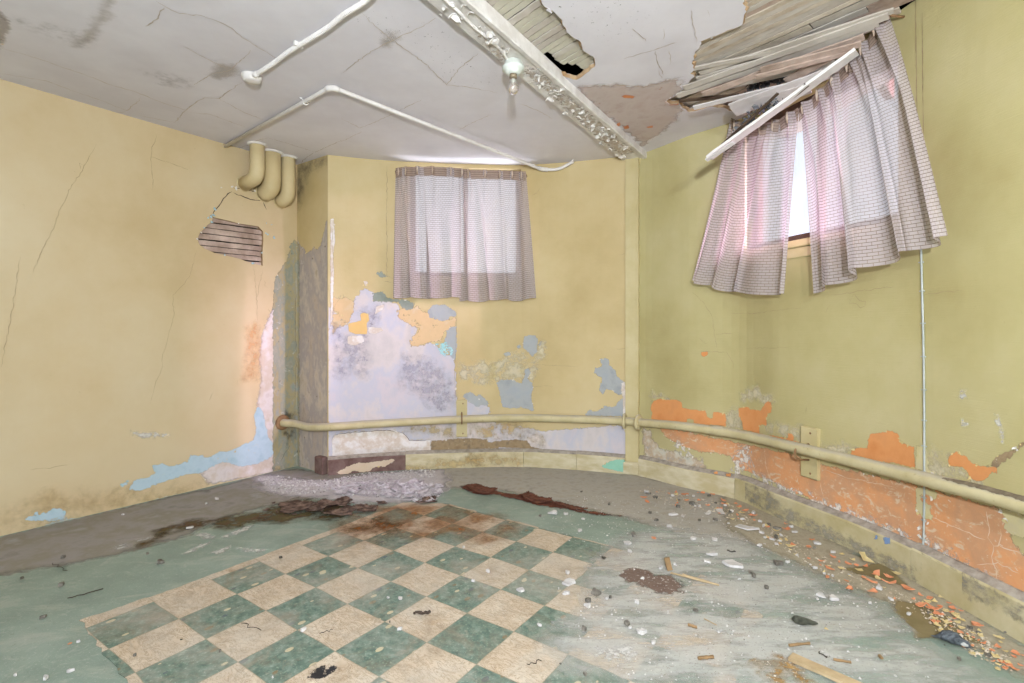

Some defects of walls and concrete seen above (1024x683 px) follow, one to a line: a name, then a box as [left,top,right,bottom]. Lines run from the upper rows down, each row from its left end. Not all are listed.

crack [8,1,421,190]
crack [347,13,497,123]
peeling [438,2,474,23]
peeling [478,26,510,60]
peeling [526,68,633,159]
crack [2,156,90,363]
spalling [196,207,275,266]
flaking render [0,217,625,576]
peeling [642,387,1024,602]